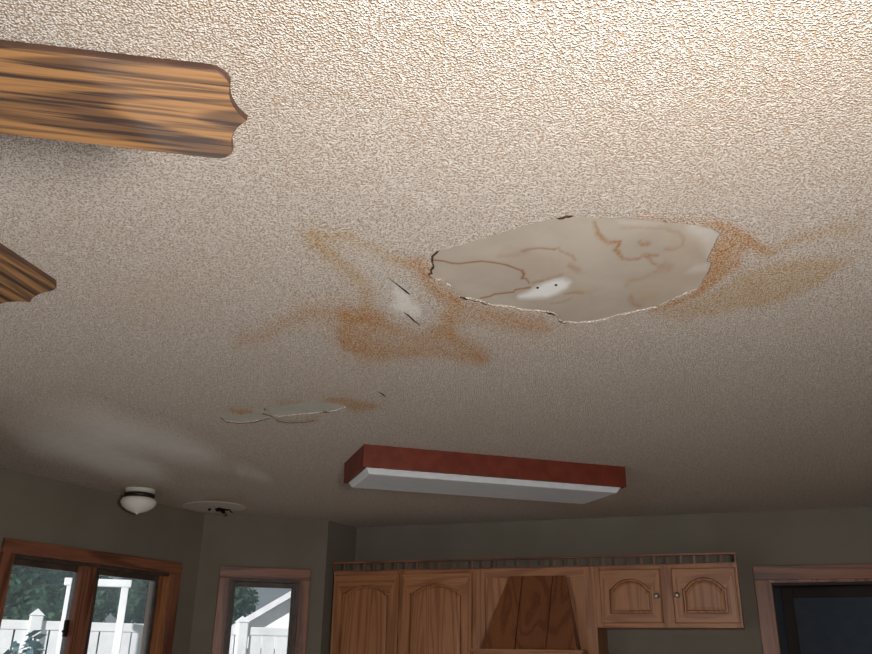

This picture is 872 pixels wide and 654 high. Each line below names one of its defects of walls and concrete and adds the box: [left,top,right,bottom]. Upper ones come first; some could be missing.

water stain [227,219,561,375]
water stain [629,212,872,325]